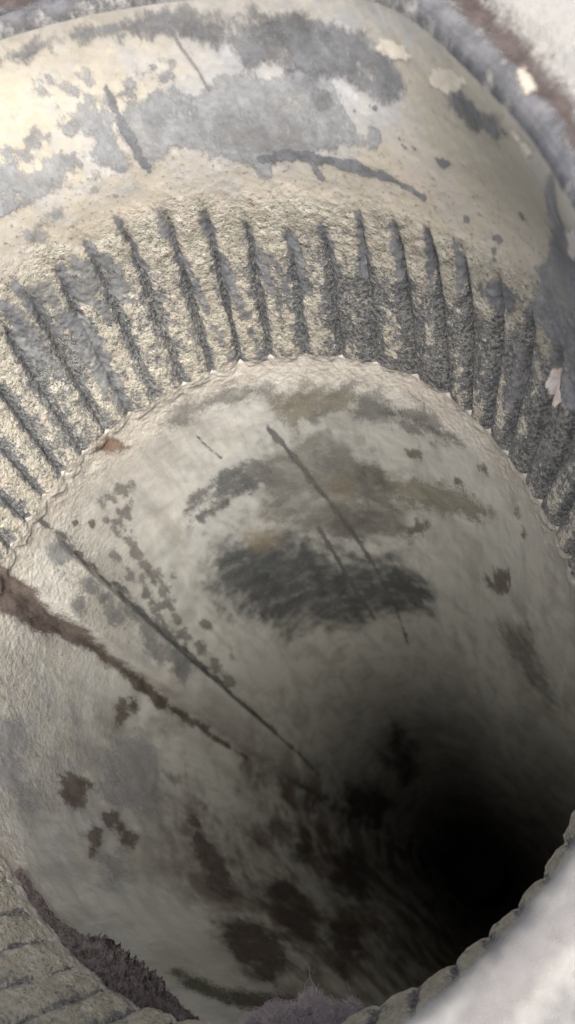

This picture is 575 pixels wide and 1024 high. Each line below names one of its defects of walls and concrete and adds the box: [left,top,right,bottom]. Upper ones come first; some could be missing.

peeling [0,6,427,217]
peeling [23,209,62,243]
damp [185,470,250,523]
damp [205,531,428,638]
crack [0,567,247,760]
crack [39,519,320,778]
damp [187,813,238,902]
damp [212,879,364,981]